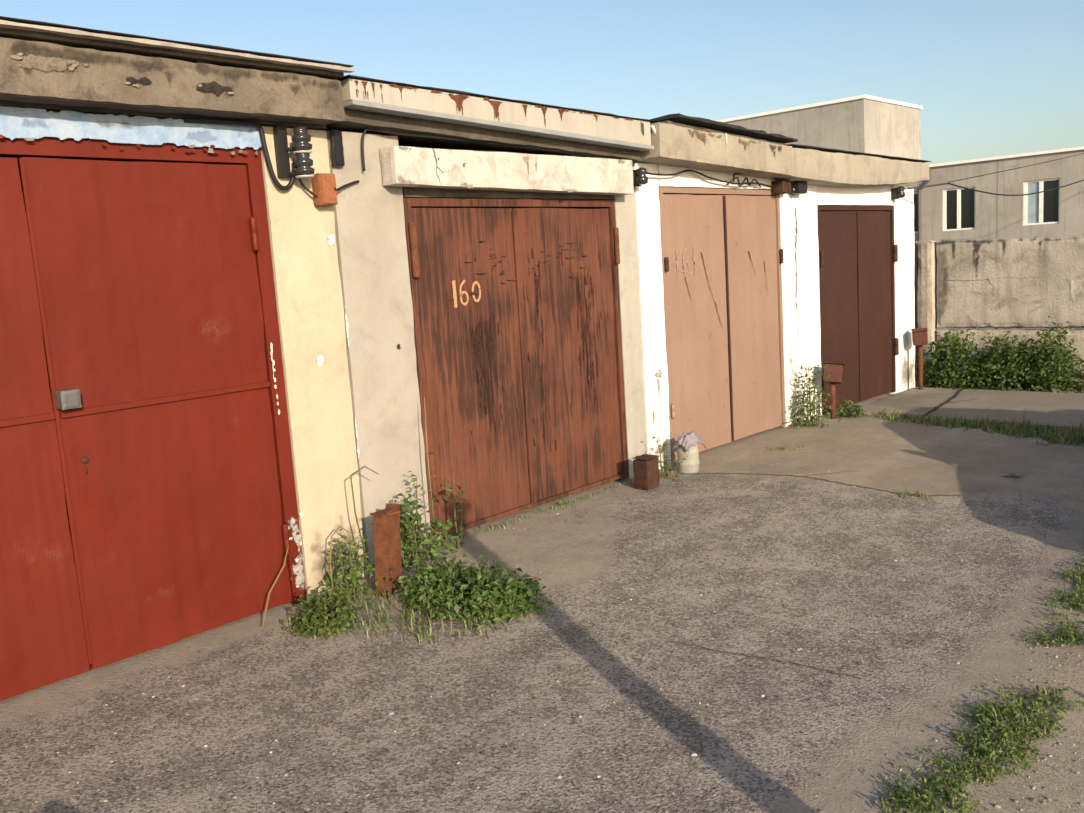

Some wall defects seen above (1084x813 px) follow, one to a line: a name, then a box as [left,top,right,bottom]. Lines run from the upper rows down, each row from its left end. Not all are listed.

spalling [10,52,89,72]
spalling [125,77,152,88]
spalling [196,81,234,96]
rust [355,80,418,102]
rust [431,90,470,113]
rust [484,97,502,118]
rust [523,104,598,128]
peeling [0,106,262,155]
damp [938,239,1006,314]
crack [668,641,863,679]